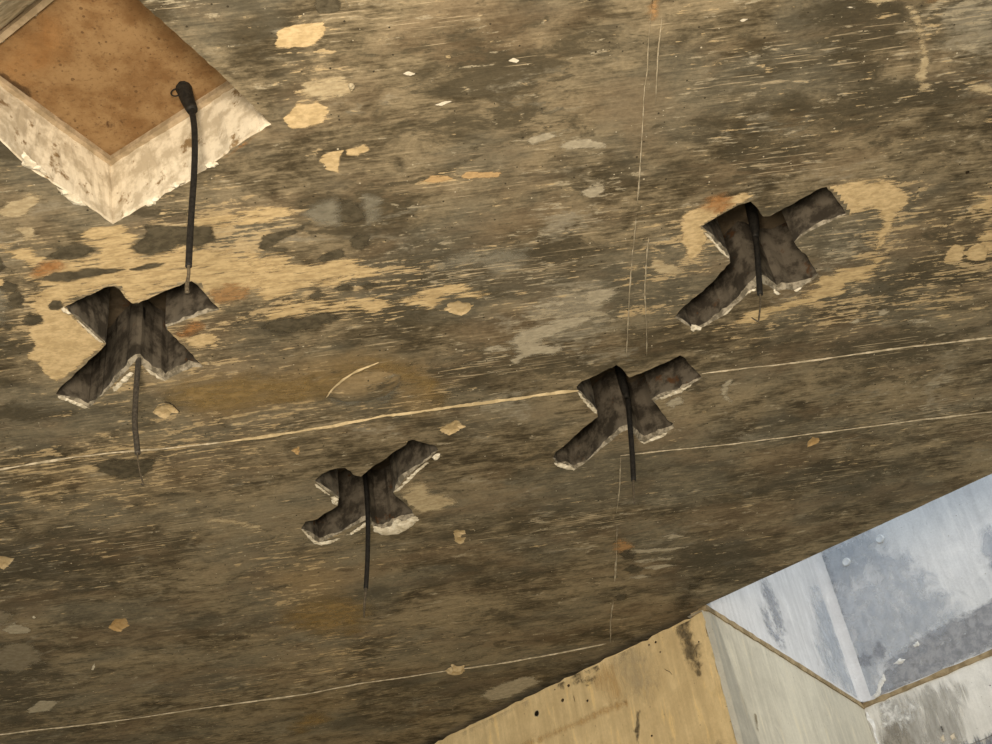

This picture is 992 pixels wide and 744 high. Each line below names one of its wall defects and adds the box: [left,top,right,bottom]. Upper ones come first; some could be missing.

crack [636,0,670,217]
peeling [906,6,934,92]
peeling [968,84,992,95]
flaking render [21,151,49,177]
flaking render [57,188,86,206]
peeling [0,193,490,381]
peeling [650,192,754,275]
peeling [723,178,909,327]
flaking render [113,372,133,391]
peeling [301,453,457,546]
damp [816,537,992,744]